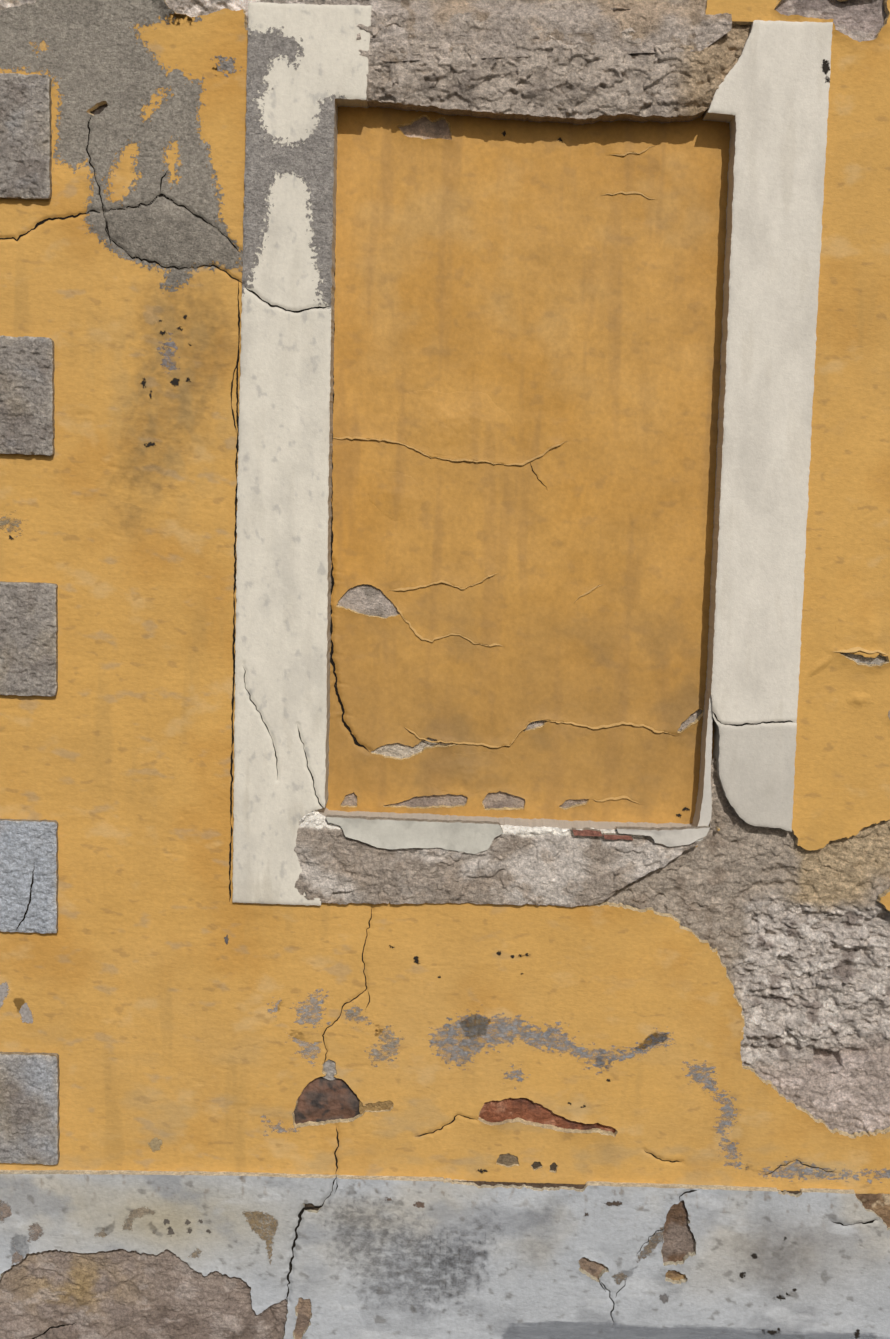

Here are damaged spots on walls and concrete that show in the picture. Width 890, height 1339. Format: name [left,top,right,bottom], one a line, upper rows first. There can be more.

peeling [0,0,732,309]
crack [0,117,336,900]
crack [330,366,568,750]
crack [404,720,672,748]
peeling [326,791,525,854]
spalling [261,989,403,1136]
crack [322,909,372,1063]
spalling [479,1064,616,1133]
spalling [572,758,890,1134]
spalling [0,1207,312,1339]
crack [286,1128,339,1301]
spalling [638,1200,695,1281]